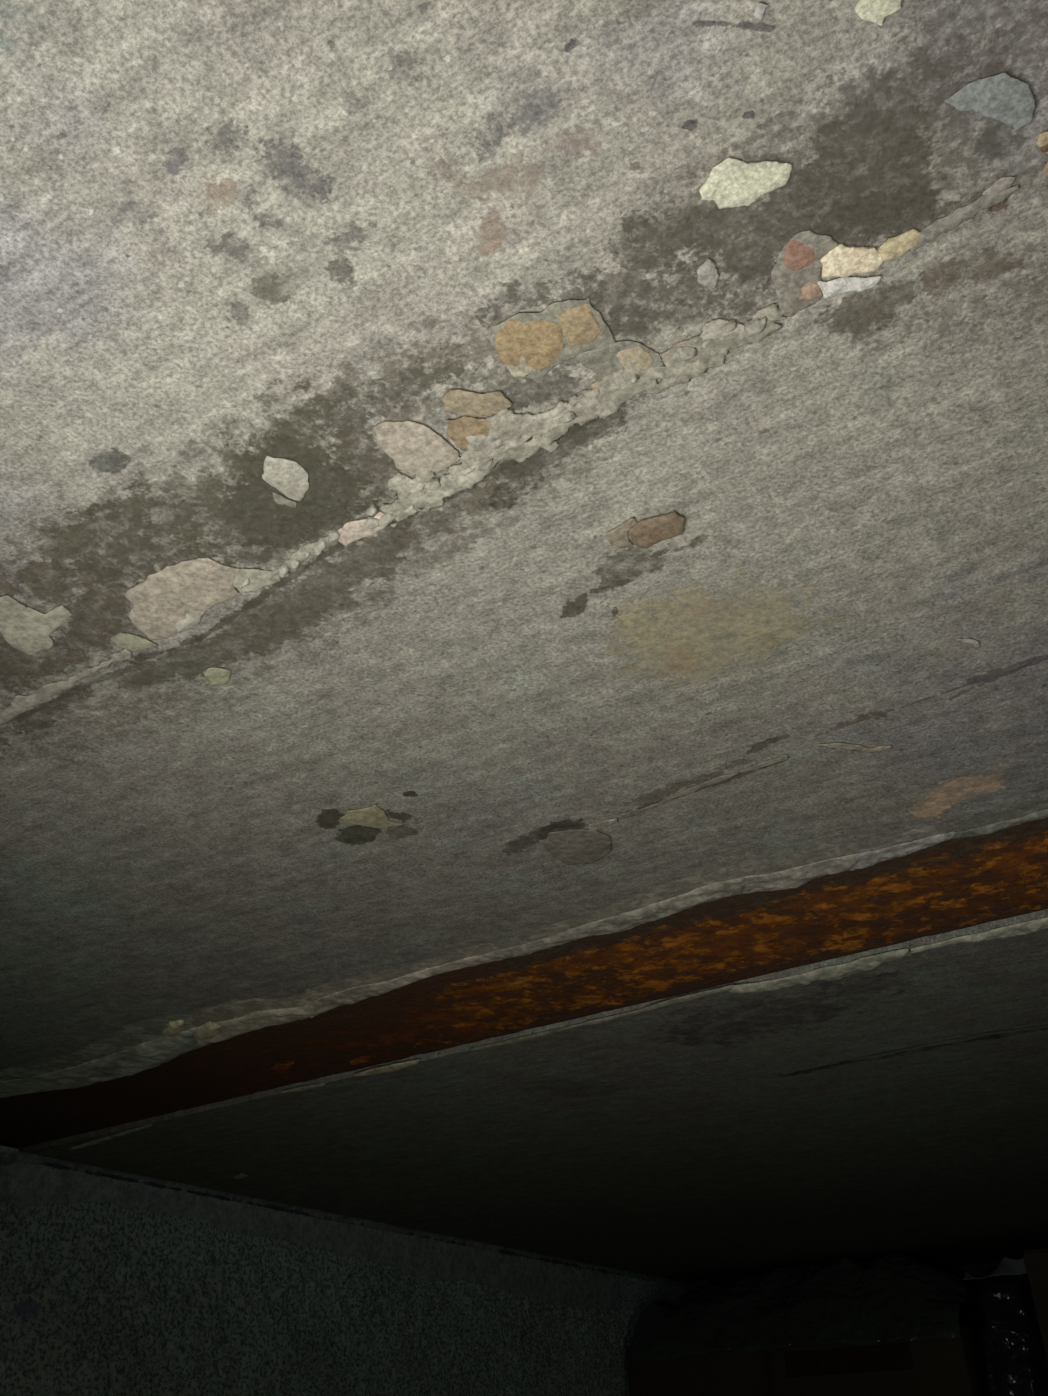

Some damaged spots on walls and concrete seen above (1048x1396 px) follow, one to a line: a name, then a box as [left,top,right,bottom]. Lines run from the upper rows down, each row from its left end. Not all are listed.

spalling [699,157,792,209]
crack [905,161,1047,256]
spalling [771,229,921,318]
damp [0,0,1048,751]
spalling [374,389,512,474]
spalling [262,456,309,508]
crack [0,283,788,727]
spalling [111,557,281,652]
crack [502,638,1048,853]
damp [316,791,418,845]
spalling [0,800,1048,1098]
rust [340,819,1048,1065]